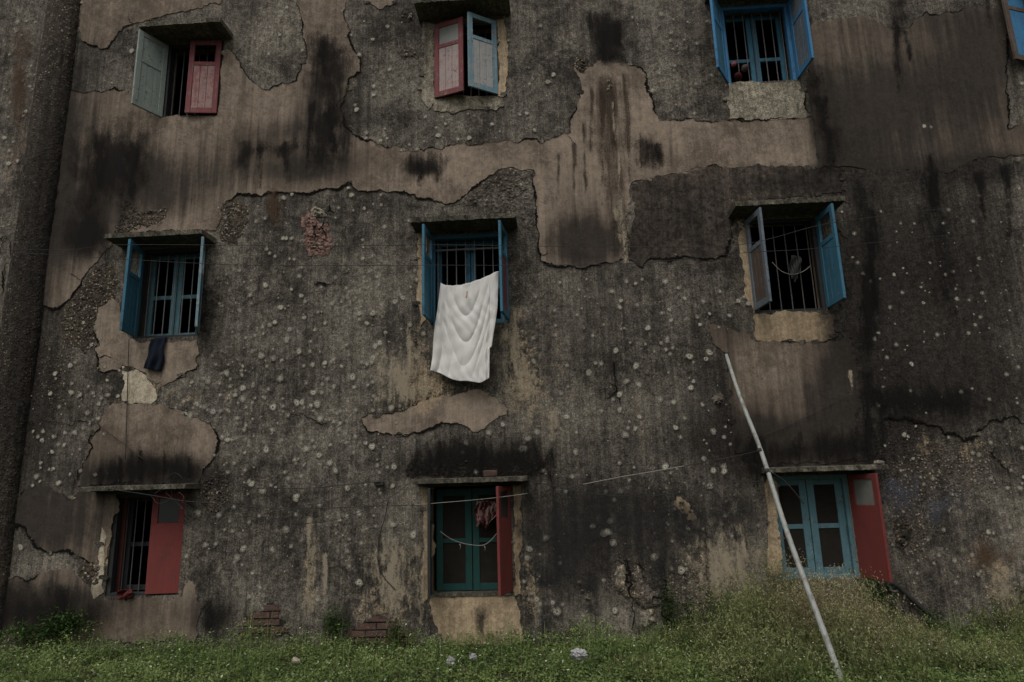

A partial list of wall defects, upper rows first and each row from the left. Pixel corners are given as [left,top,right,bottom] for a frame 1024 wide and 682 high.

leakage [236,34,351,186]
leakage [557,74,663,263]
leakage [892,0,912,87]
peeling [43,0,1024,512]
leakage [848,180,986,450]
crack [877,406,1021,473]
peeling [1,485,205,645]
crack [615,558,693,630]
leakage [687,527,762,603]